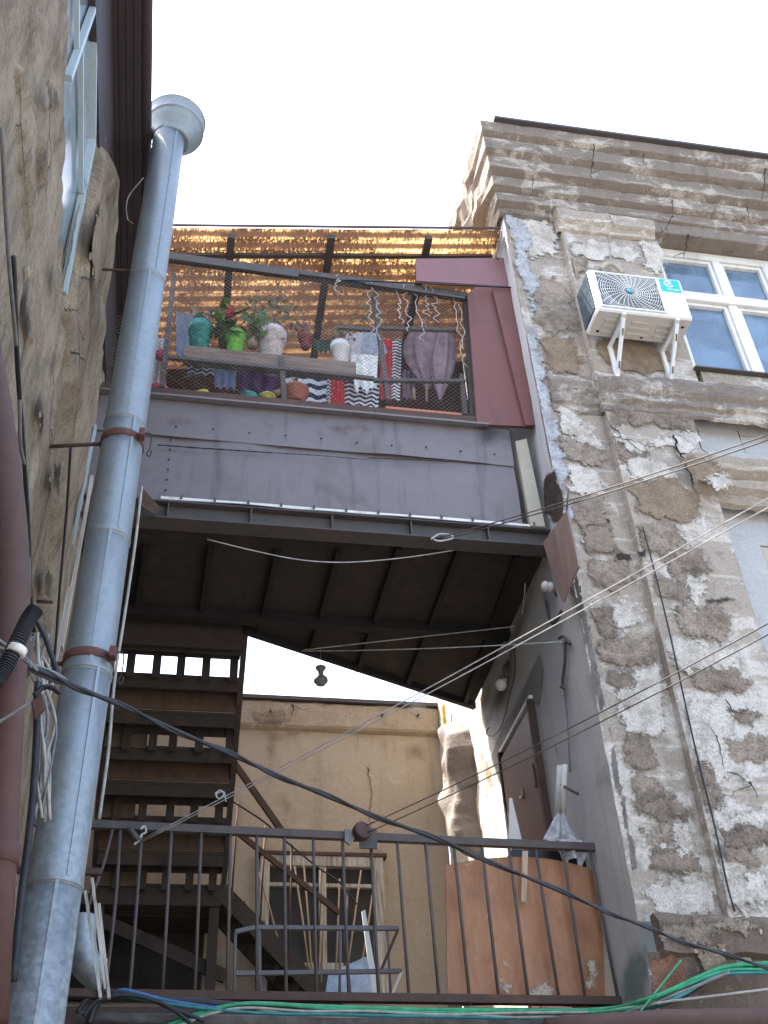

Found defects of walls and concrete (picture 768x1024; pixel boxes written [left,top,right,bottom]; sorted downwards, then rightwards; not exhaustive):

crack [656,199,701,259]
crack [672,435,709,492]
peeling [505,215,768,994]
crack [703,722,758,798]